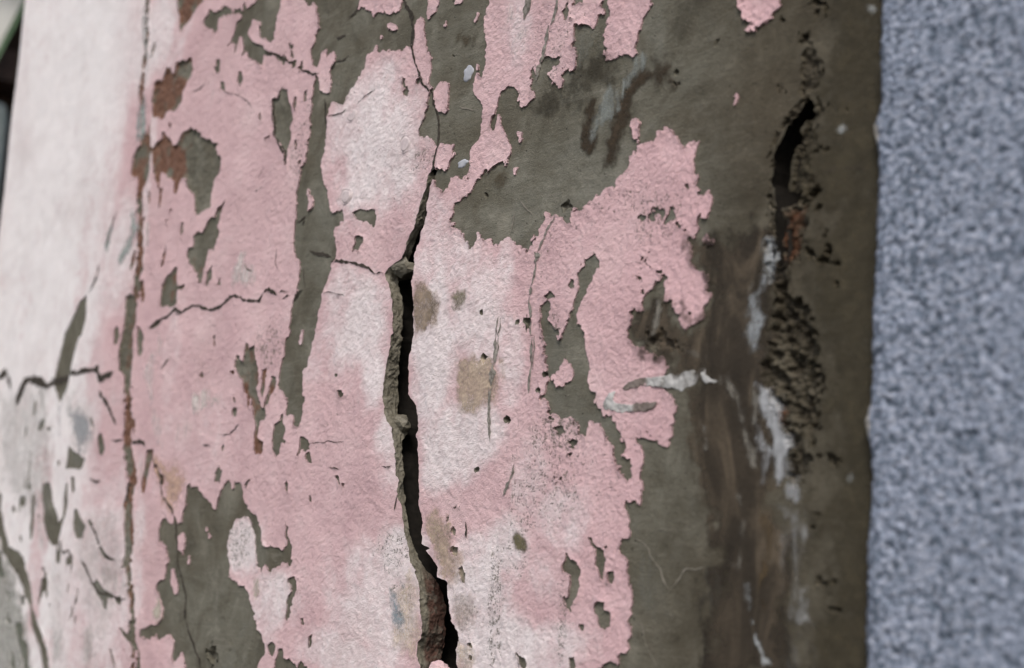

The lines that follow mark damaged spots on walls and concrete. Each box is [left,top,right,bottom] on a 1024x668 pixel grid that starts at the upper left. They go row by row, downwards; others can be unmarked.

crack [0,365,201,667]
peeling [94,0,307,668]
crack [149,0,473,668]
peeling [178,0,883,668]
water stain [631,0,883,668]